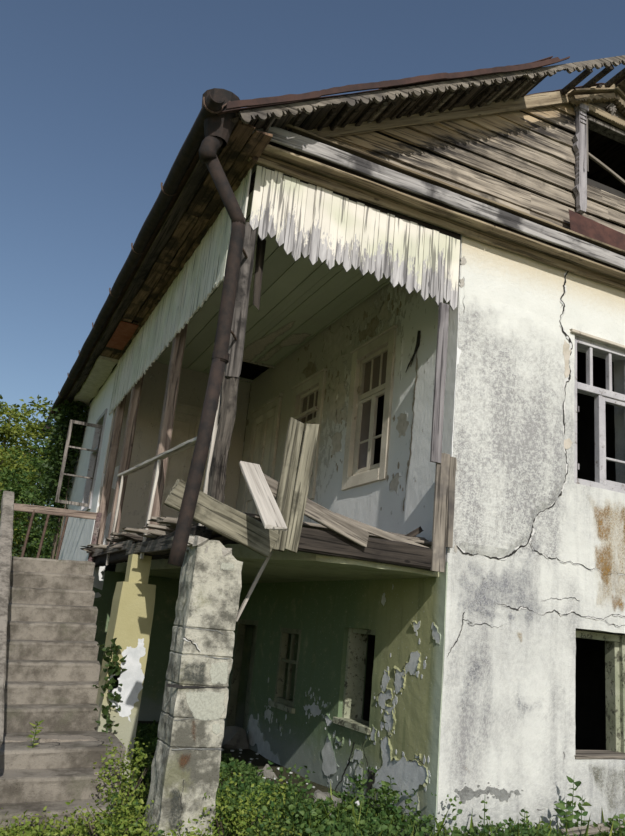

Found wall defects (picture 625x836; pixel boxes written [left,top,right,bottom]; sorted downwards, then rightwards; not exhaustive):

crack [401,330,421,513]
crack [457,271,625,575]
crack [447,612,499,657]
crack [500,597,625,628]
peeling [108,638,146,722]
peeling [247,696,291,765]
flaking render [303,620,431,821]
flaking render [454,782,523,804]